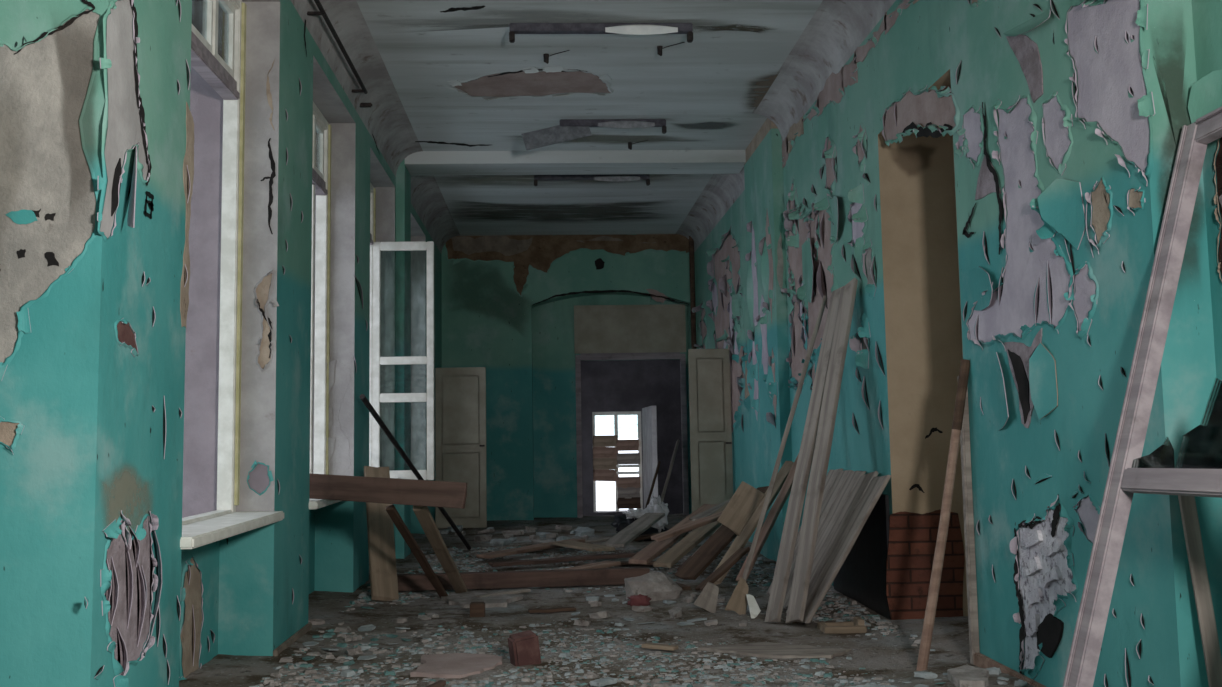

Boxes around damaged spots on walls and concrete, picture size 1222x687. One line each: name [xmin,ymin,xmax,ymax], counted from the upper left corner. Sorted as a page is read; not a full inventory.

crack [14,0,95,55]
flaking render [447,67,614,100]
flaking render [0,0,152,381]
crack [260,138,276,234]
flaking render [253,265,292,372]
flaking render [444,234,689,297]
flaking render [692,0,919,435]
flaking render [882,0,1155,430]
flaking render [1213,137,1222,281]
flaking render [84,510,215,687]
flaking render [886,509,965,620]
flaking render [985,451,1101,687]